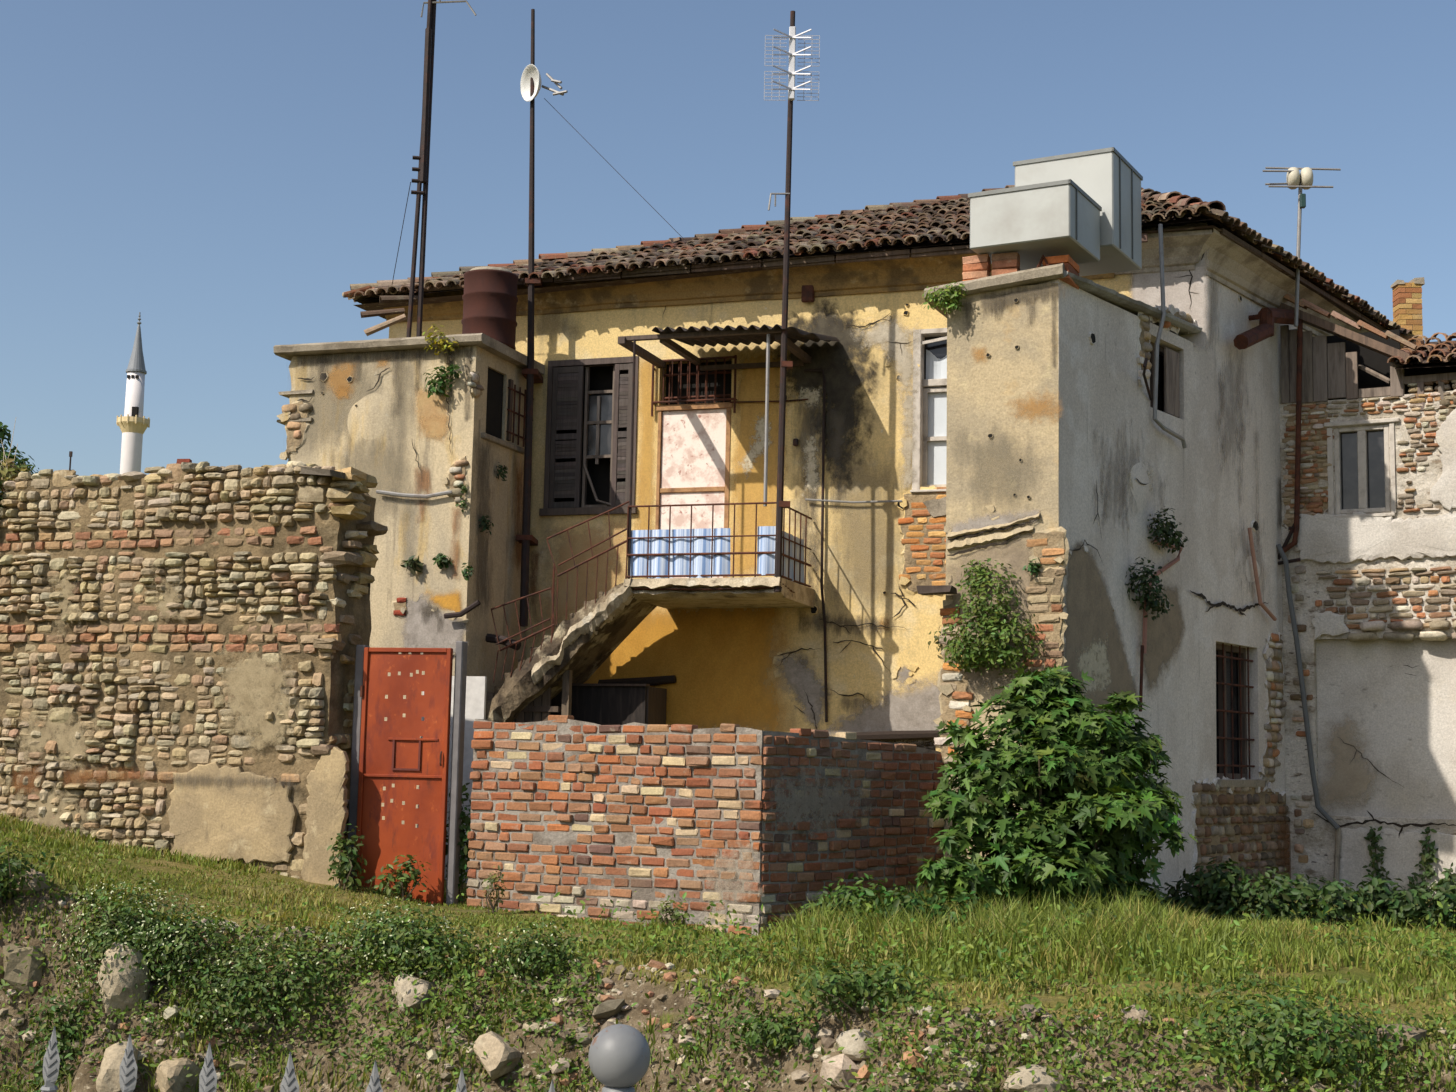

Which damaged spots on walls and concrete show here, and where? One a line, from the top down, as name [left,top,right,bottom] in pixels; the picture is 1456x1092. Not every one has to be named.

spalling [277,372,354,460]
water stain [775,301,876,576]
crack [778,587,916,730]
spalling [773,303,1088,764]
crack [1191,591,1268,616]
flaking render [1191,380,1456,891]
crack [1338,737,1403,787]
crack [1314,811,1456,836]